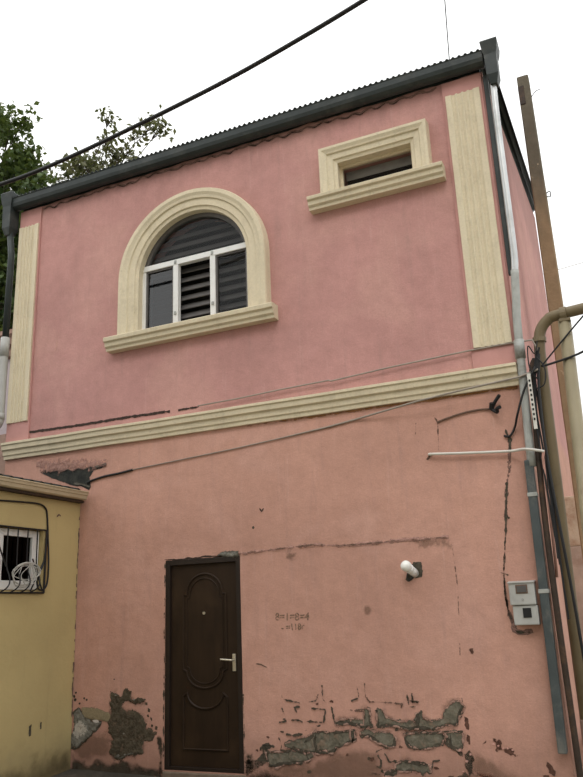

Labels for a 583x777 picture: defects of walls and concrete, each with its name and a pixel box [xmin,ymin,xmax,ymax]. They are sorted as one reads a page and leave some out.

crack [29,406,197,433]
spalling [36,459,107,490]
crack [503,429,533,635]
crack [164,555,216,662]
crack [238,537,459,612]
spalling [71,688,162,773]
crack [244,683,419,753]
spalling [246,700,474,777]